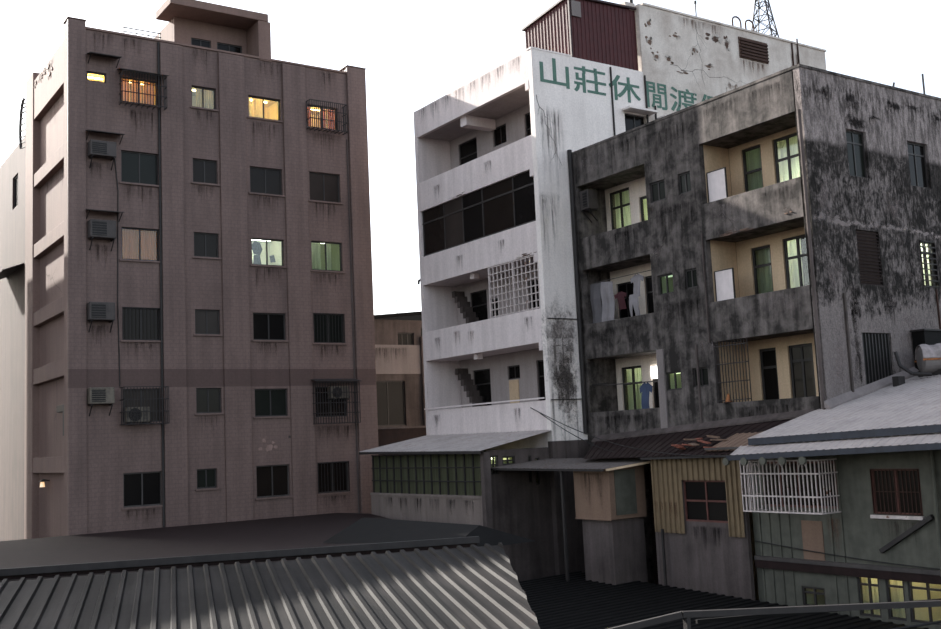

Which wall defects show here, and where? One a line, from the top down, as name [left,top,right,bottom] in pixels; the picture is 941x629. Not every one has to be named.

mould [845,114,880,128]
damp [813,212,941,239]
damp [542,312,577,418]
damp [850,292,862,383]